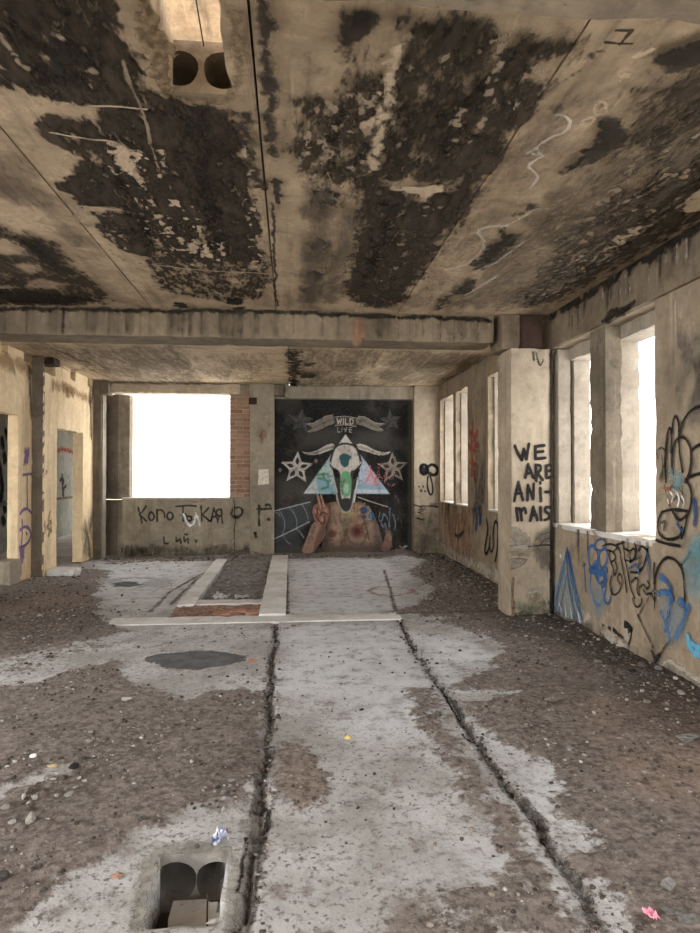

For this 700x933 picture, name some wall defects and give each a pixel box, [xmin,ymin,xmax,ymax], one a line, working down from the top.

damp [0,0,700,332]
damp [284,349,319,387]
crack [234,571,290,933]
crack [383,570,609,933]